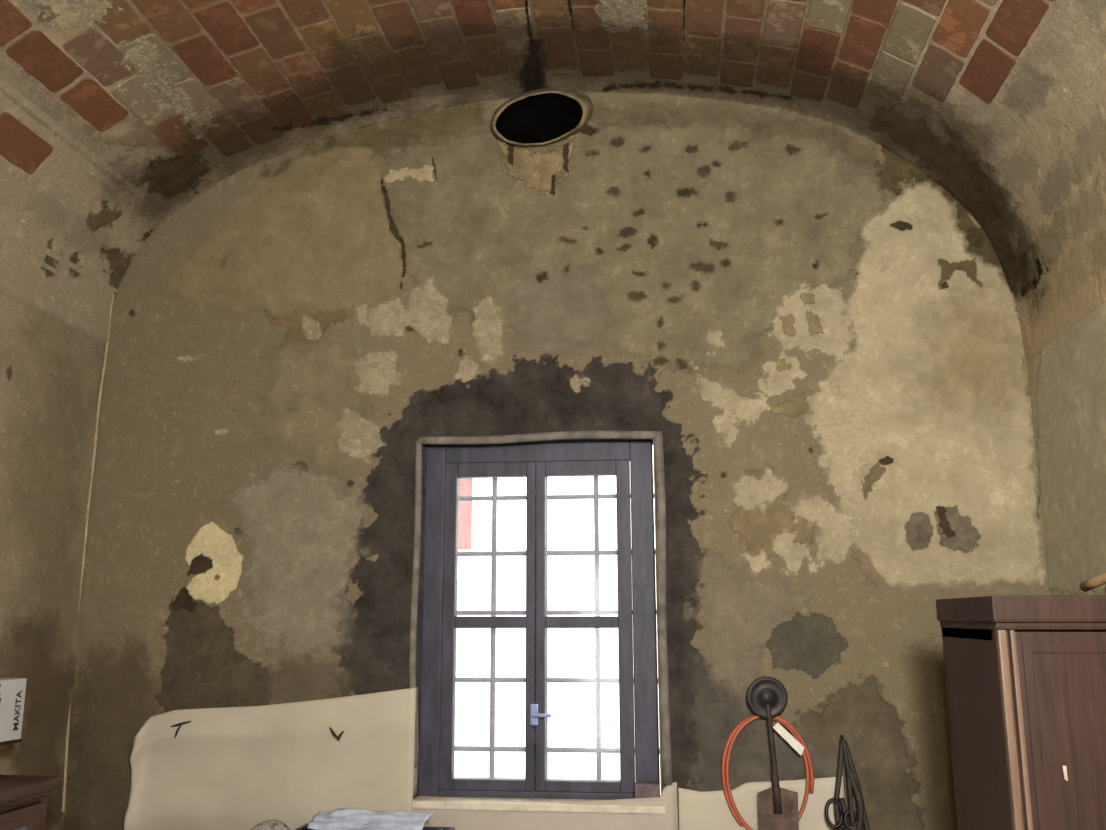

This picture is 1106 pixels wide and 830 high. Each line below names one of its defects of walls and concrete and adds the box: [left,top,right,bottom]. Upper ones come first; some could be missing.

leakage [40,238,82,277]
leakage [87,201,121,231]
leakage [101,247,136,300]
leakage [122,22,1045,312]
flaking render [265,112,1045,586]
leakage [5,354,924,830]